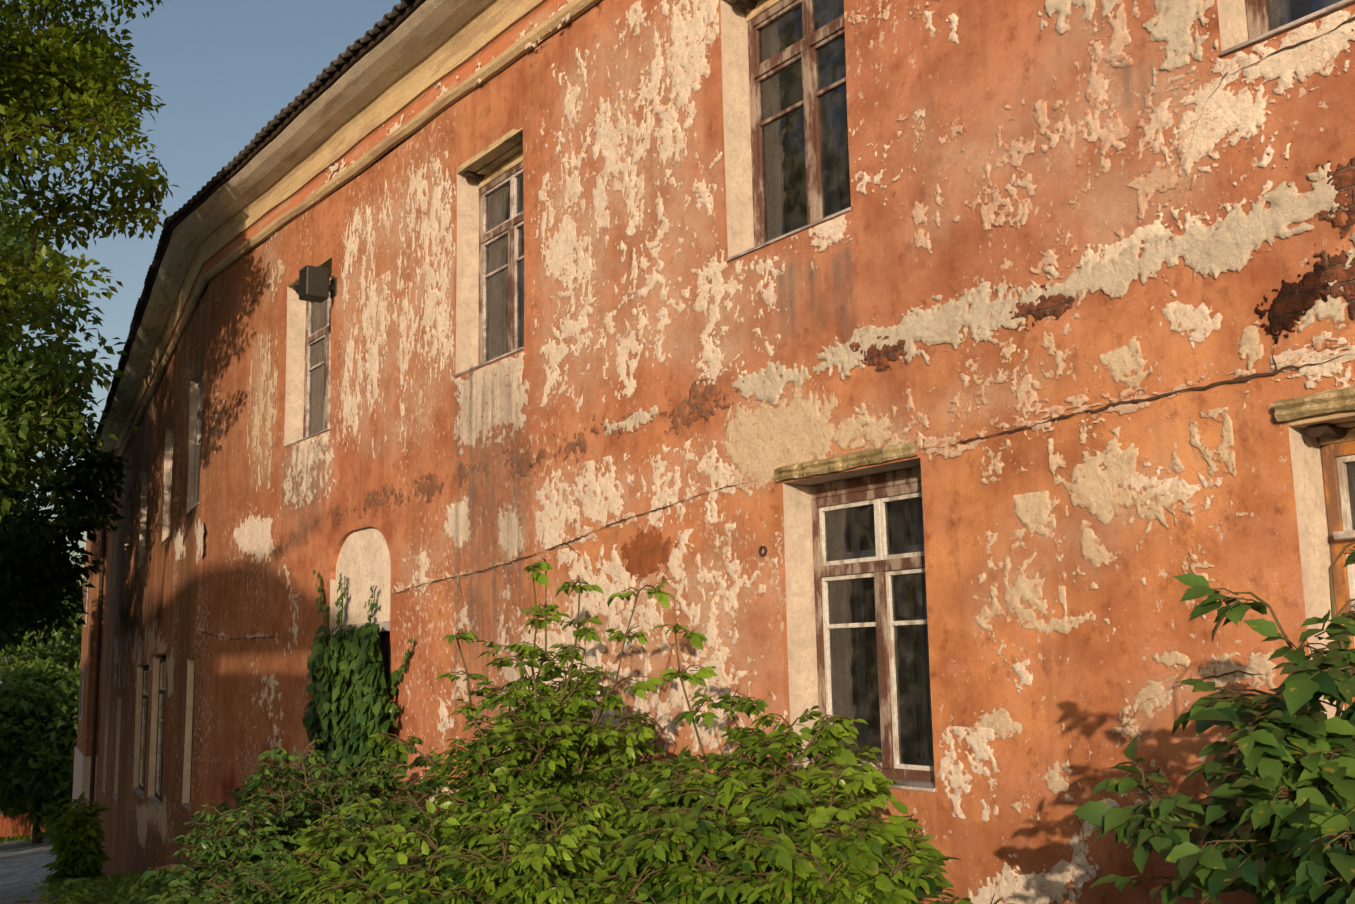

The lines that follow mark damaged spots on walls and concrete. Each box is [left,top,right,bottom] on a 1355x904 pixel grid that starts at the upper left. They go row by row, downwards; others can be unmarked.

crack [1190,16,1355,145]
flaking render [233,0,1355,758]
crack [921,321,1354,461]
crack [392,467,763,614]
flaking render [245,662,325,792]
flaking render [939,688,1081,824]
flaking render [1102,759,1170,809]
flaking render [968,817,1105,904]